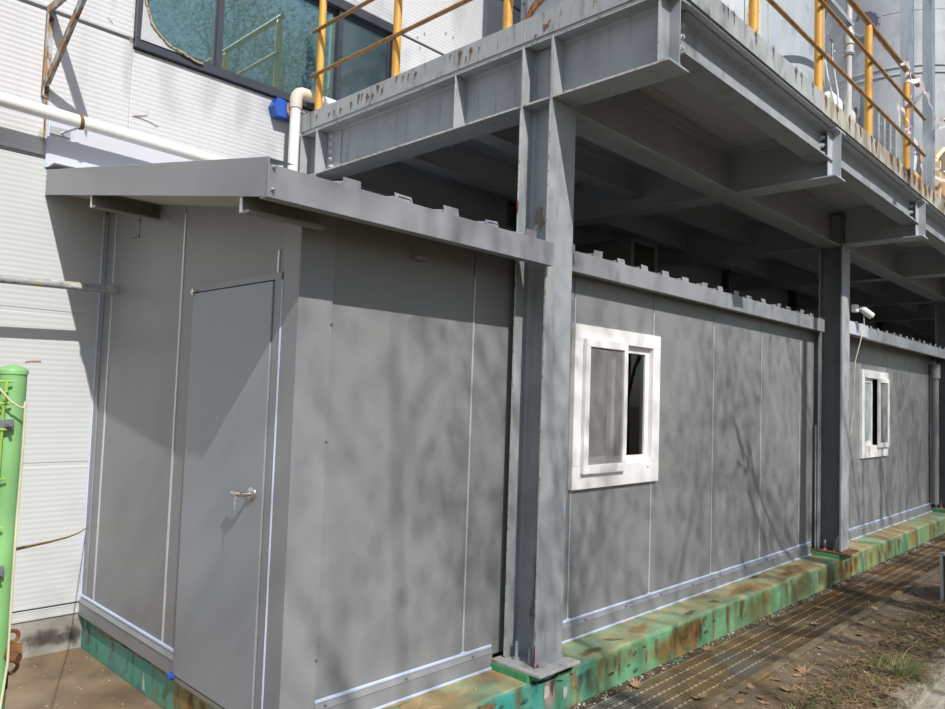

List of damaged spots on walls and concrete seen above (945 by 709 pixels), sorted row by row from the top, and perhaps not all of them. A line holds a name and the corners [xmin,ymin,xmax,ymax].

corrosion [825,95,878,153]
corrosion [890,153,935,200]
corrosion [709,576,757,624]
corrosion [584,624,645,676]
corrosion [646,611,705,660]